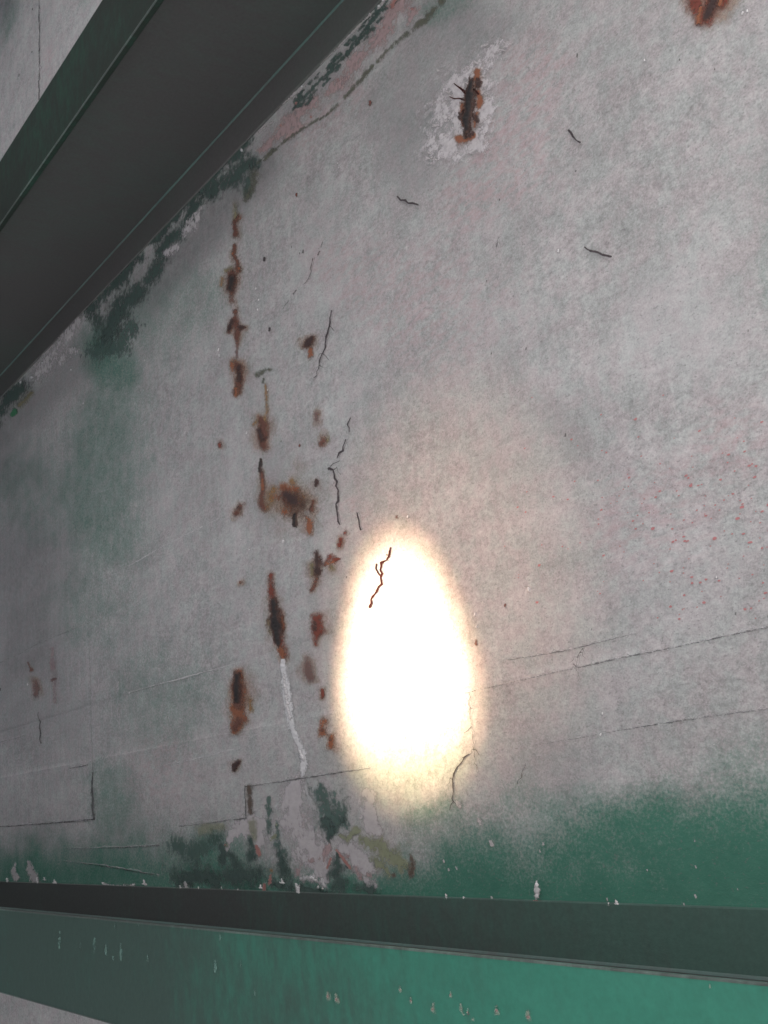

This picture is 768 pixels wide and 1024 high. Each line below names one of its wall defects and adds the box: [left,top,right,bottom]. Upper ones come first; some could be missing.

rust [686,0,733,28]
rust [220,203,247,397]
crack [314,310,333,378]
rust [252,384,319,535]
crack [328,417,362,530]
rust [267,573,288,659]
rust [309,532,346,592]
crack [368,547,391,608]
rust [229,669,254,735]
efflorescence [280,659,315,810]
crack [446,693,479,808]
peeling [224,775,383,893]